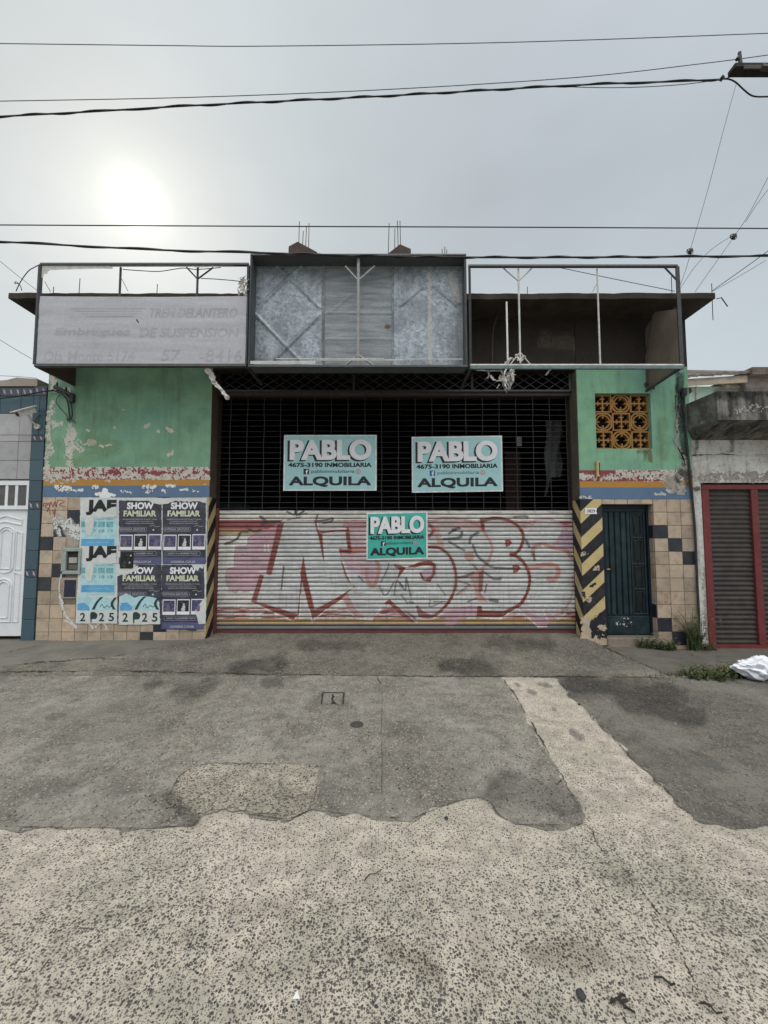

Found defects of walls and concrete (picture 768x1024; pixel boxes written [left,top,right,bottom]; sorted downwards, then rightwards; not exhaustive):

peeling [43,376,210,494]
peeling [579,402,768,645]